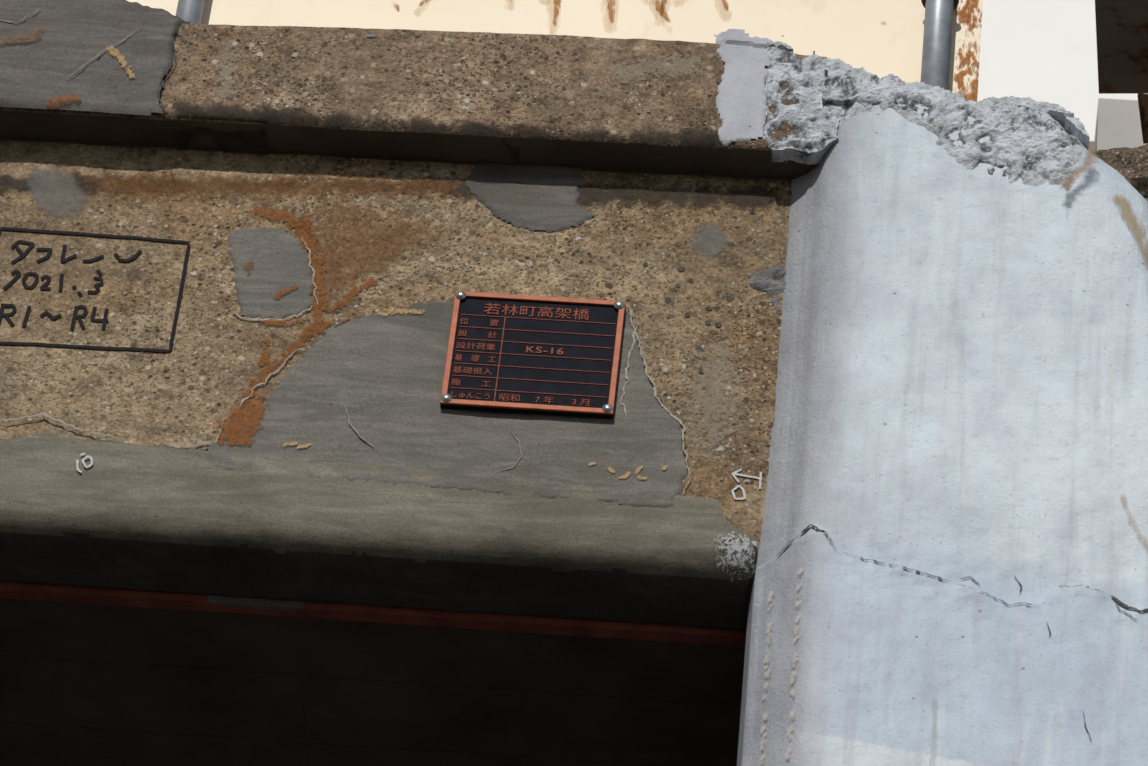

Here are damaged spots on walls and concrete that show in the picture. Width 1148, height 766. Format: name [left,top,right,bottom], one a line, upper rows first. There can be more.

corrosion [652,0,670,21]
spalling [822,58,1090,188]
corrosion [212,206,377,446]
crack [777,524,1051,636]
crack [1058,585,1148,620]